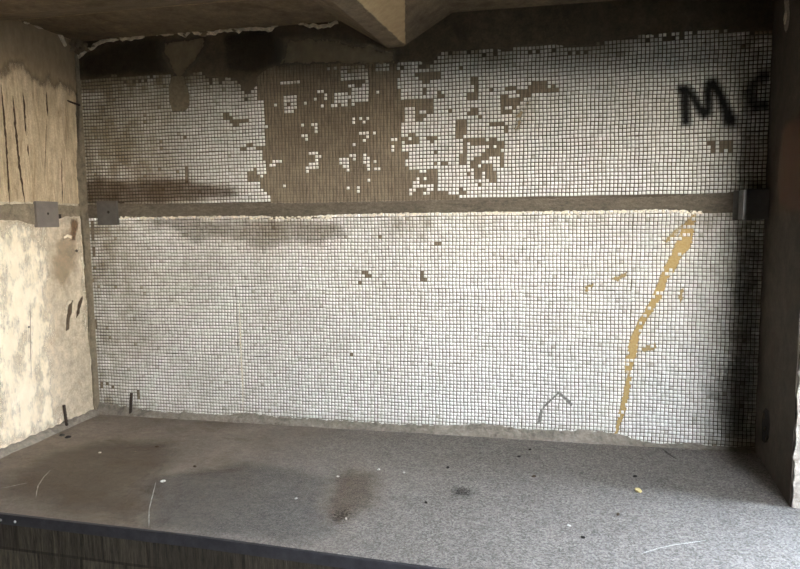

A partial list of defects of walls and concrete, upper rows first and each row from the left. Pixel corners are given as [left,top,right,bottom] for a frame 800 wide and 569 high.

spalling [156,26,278,38]
spalling [298,21,338,29]
spalling [58,35,145,59]
crack [1,87,48,202]
peeling [240,63,467,204]
peeling [448,77,559,187]
damp [87,180,235,204]